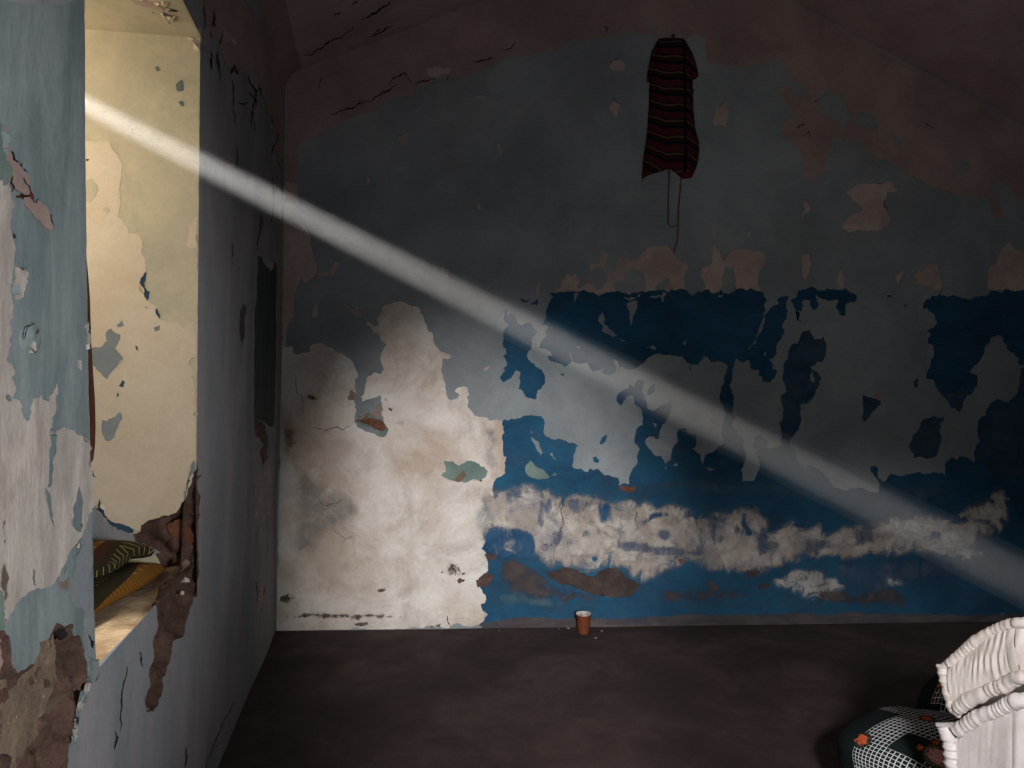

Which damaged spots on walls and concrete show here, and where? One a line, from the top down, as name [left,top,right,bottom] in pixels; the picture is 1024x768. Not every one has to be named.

crack [203,6,283,270]
crack [304,1,393,88]
crack [330,73,448,115]
peeling [0,123,200,768]
peeling [254,179,1024,631]